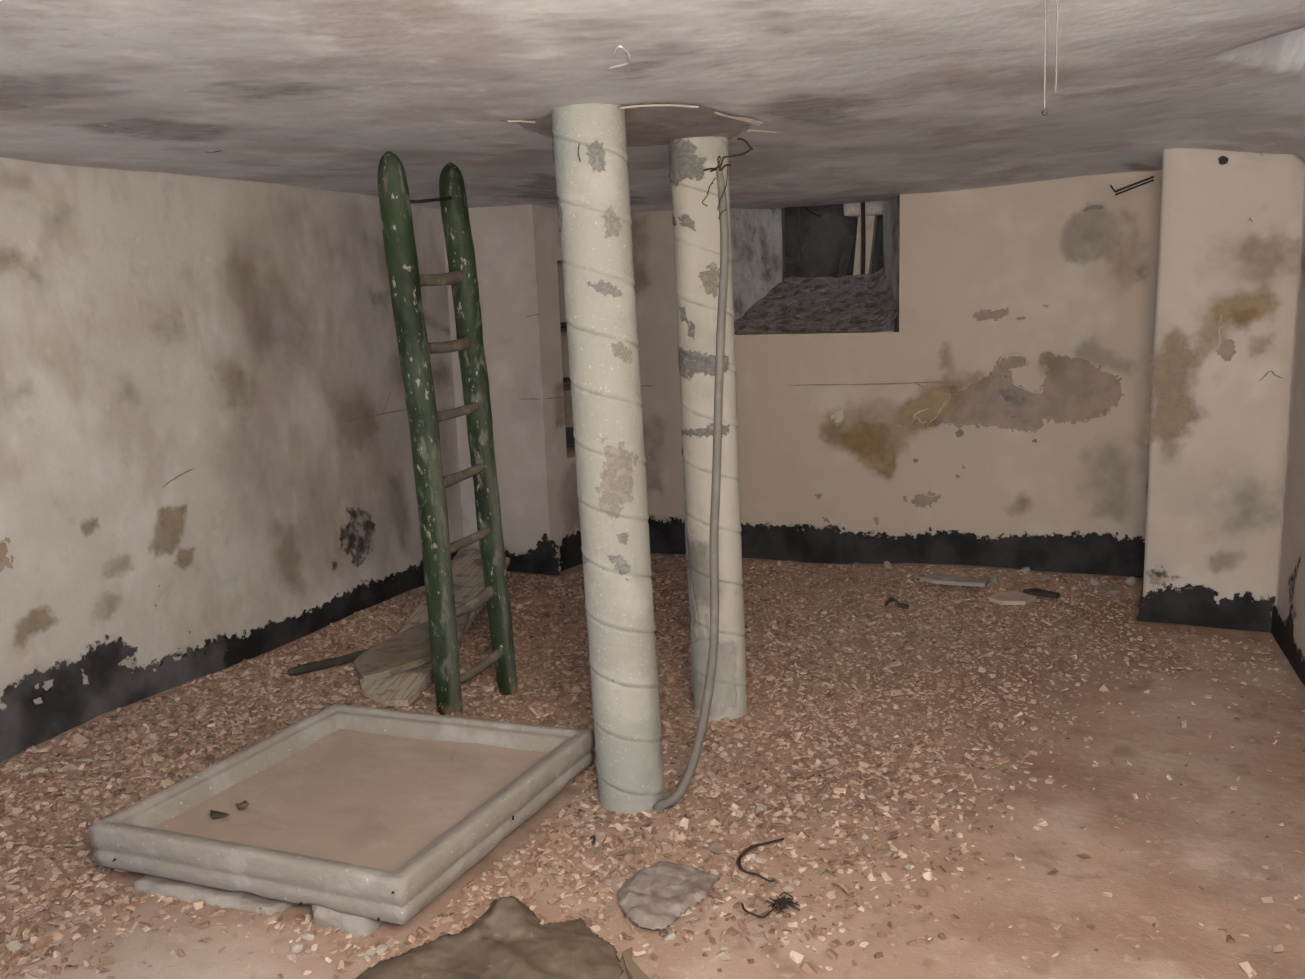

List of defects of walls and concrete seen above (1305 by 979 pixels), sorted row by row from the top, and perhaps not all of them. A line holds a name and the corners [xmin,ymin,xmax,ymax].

spalling [611,342,632,363]
spalling [678,306,731,381]
flaking render [1216,315,1236,361]
peeling [896,350,1124,443]
spalling [682,424,730,453]
spalling [596,438,638,518]
peeling [0,538,14,572]
damp [333,508,375,569]
spalling [608,532,629,580]
damp [18,608,54,637]